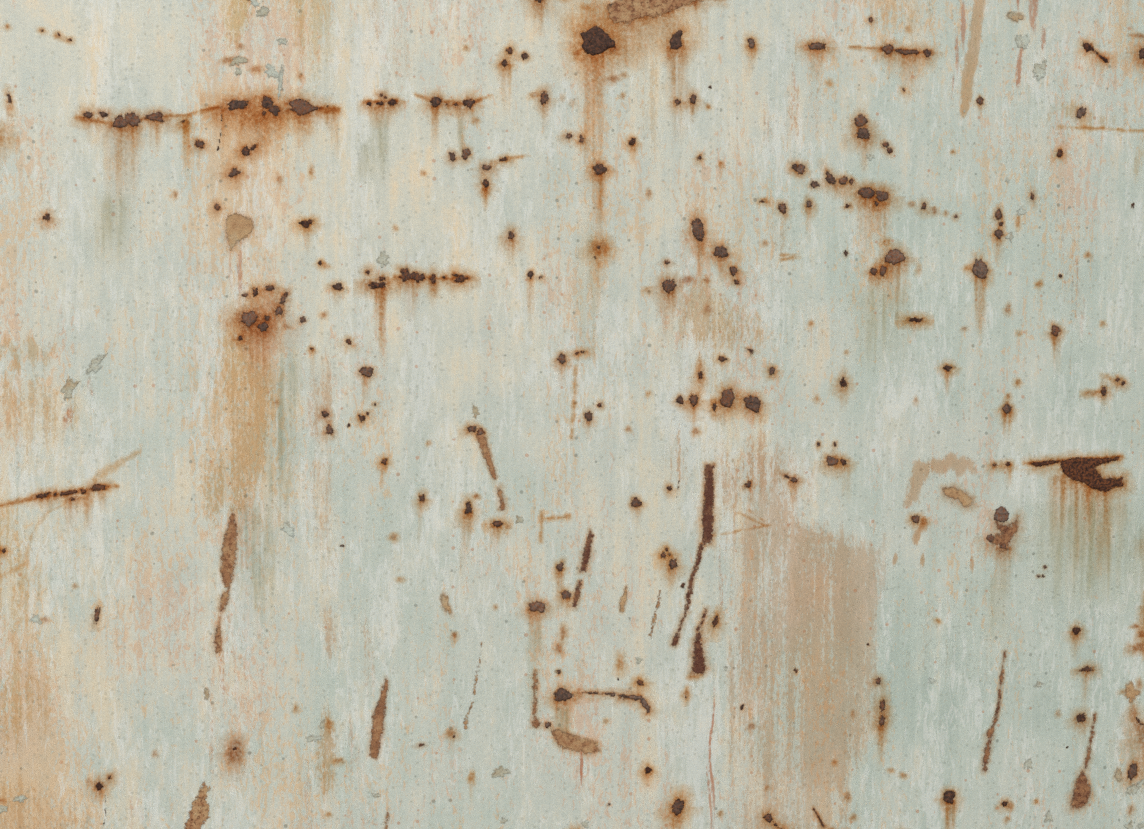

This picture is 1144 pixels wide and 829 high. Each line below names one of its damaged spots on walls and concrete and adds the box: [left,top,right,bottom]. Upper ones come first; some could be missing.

peeling [608,0,703,24]
corrosion [581,26,615,55]
corrosion [83,111,163,128]
corrosion [227,96,328,116]
corrosion [792,164,888,207]
corrosion [238,285,288,340]
corrosion [1031,457,1123,492]
corrosion [36,484,105,501]
corrosion [554,688,573,701]
peeling [184,782,211,829]